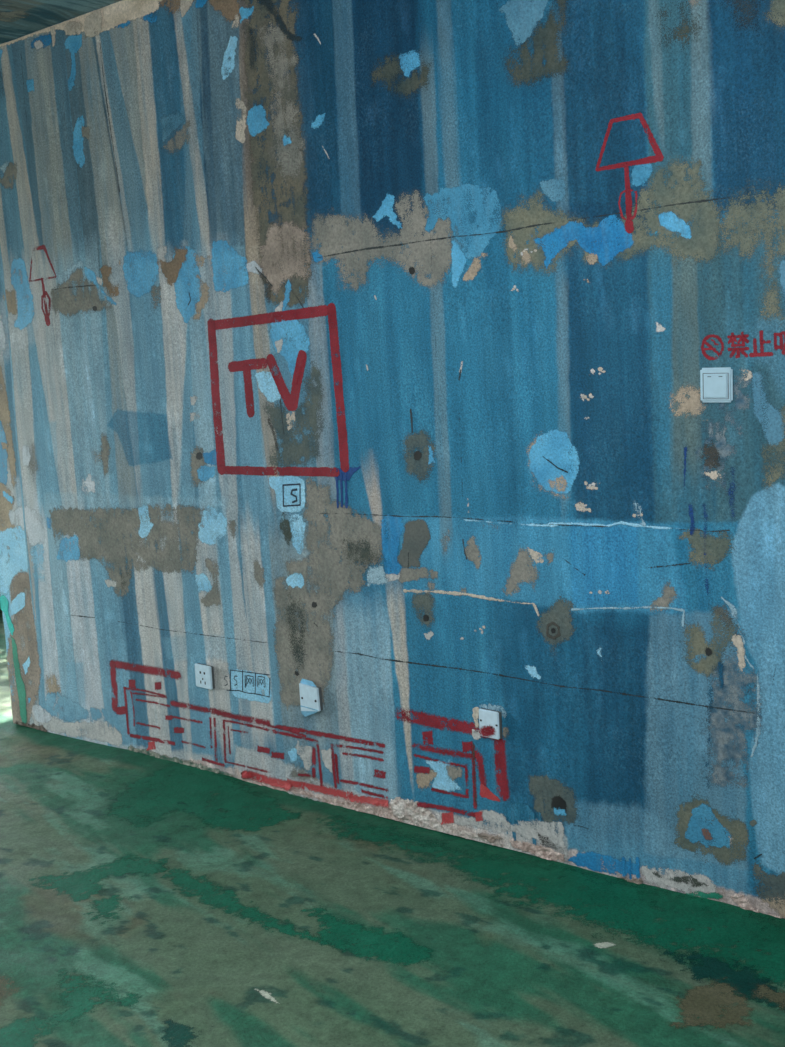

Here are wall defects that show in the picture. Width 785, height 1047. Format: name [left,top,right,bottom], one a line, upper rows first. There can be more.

peeling [72,116,90,168]
crack [318,197,730,271]
peeling [51,240,249,324]
flaking render [115,0,785,709]
peeling [0,257,785,1011]
crack [335,651,754,714]